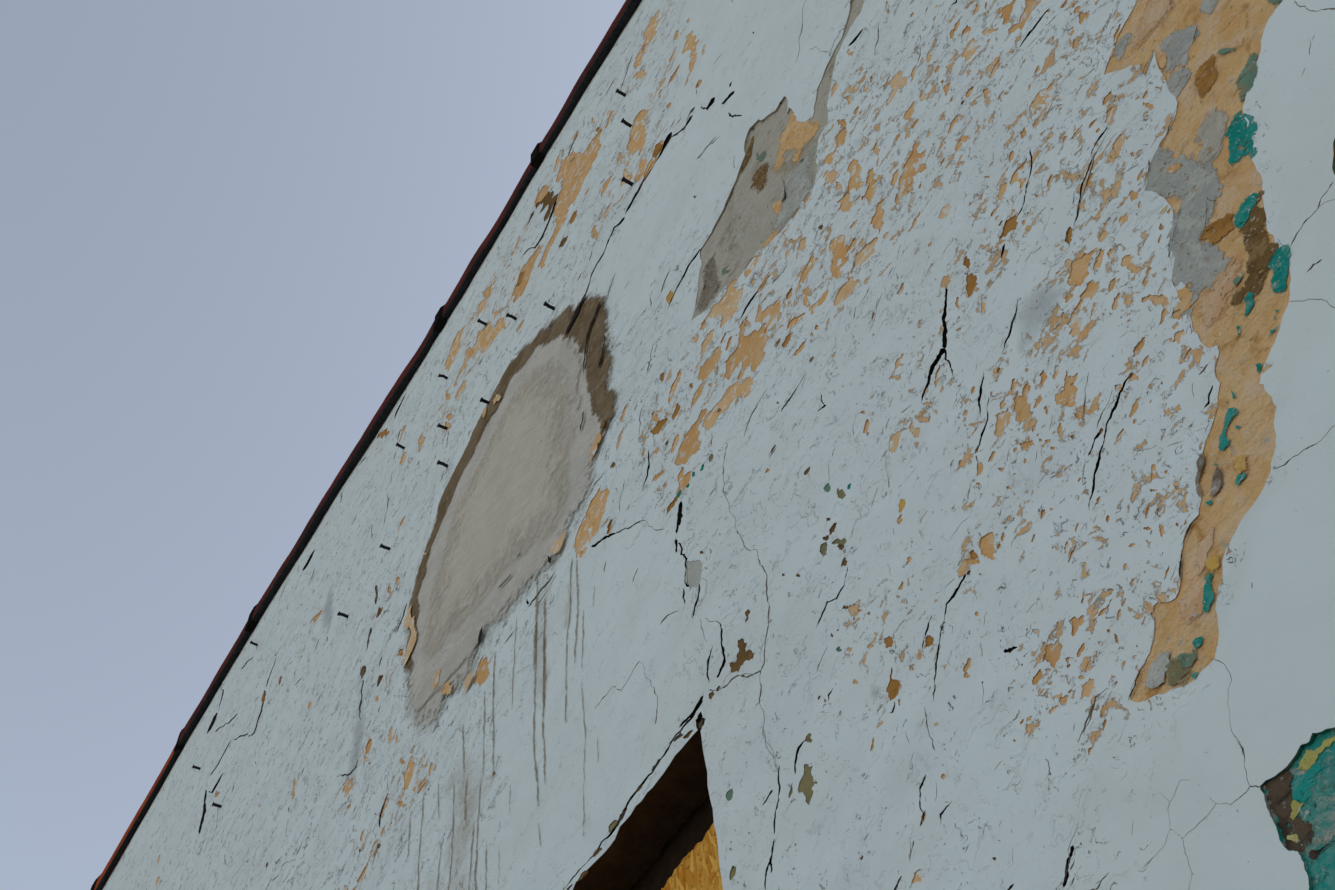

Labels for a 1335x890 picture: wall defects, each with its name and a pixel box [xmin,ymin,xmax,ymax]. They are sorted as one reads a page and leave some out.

peeling [444,109,664,431]
crack [725,159,900,348]
peeling [650,0,1004,514]
crack [810,286,1152,538]
peeling [958,349,1079,489]
peeling [1056,0,1292,702]
crack [808,539,861,699]
crack [877,573,1014,890]
peeling [1004,564,1135,729]
crack [1056,826,1107,890]
crack [1074,666,1145,742]
flaking render [1260,727,1335,890]